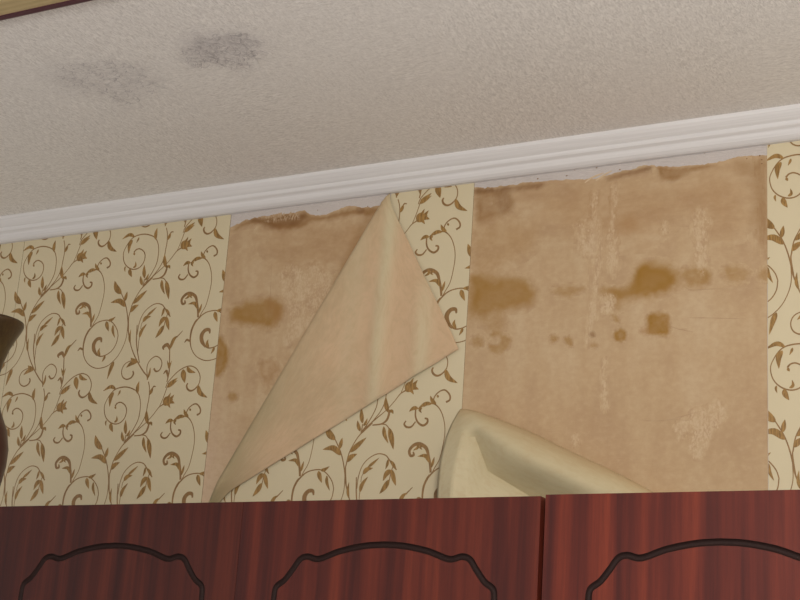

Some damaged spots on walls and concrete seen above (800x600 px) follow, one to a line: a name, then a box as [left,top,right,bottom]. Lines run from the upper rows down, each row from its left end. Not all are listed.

mould [171,24,282,78]
flaking render [230,195,387,227]
water stain [467,155,768,358]
water stain [214,293,287,380]
peeling [277,259,334,349]
peeling [462,145,768,492]